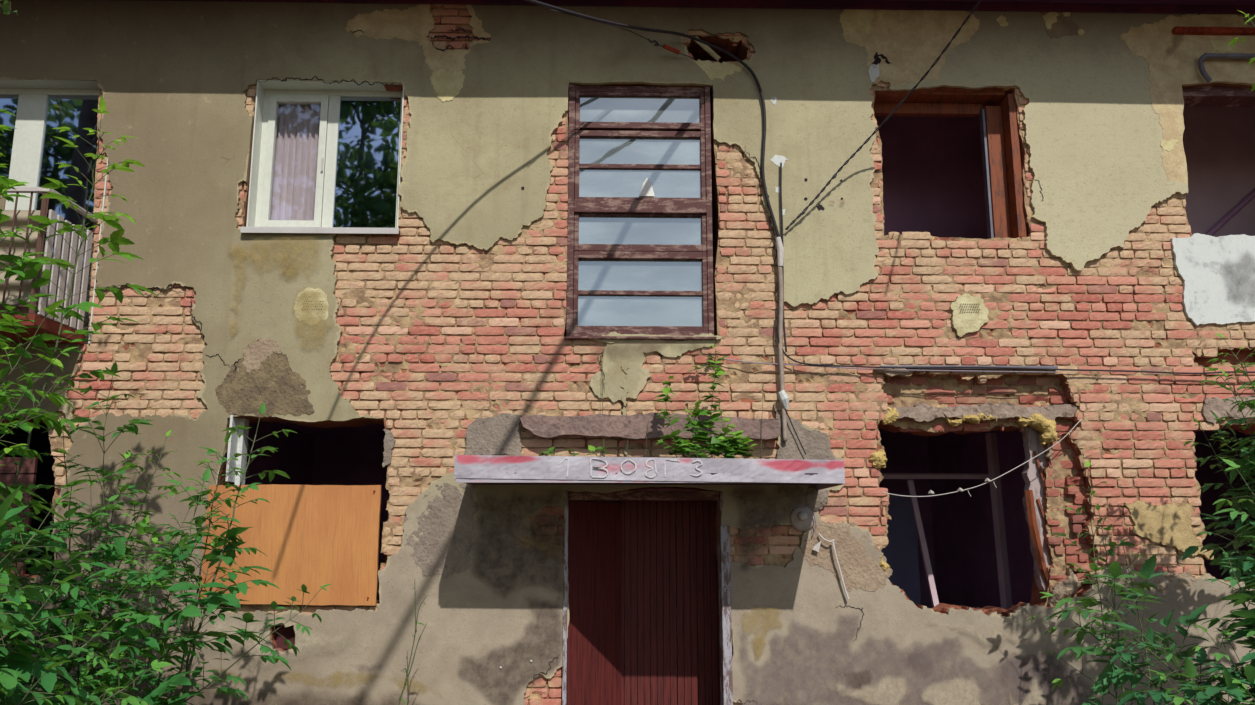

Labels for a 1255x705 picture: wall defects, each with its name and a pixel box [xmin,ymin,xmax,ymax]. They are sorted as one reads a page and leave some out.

spalling [48,85,314,509]
spalling [330,4,1255,592]
water stain [108,681,364,705]
water stain [471,604,559,703]
spalling [524,668,562,705]
water stain [743,608,1087,705]